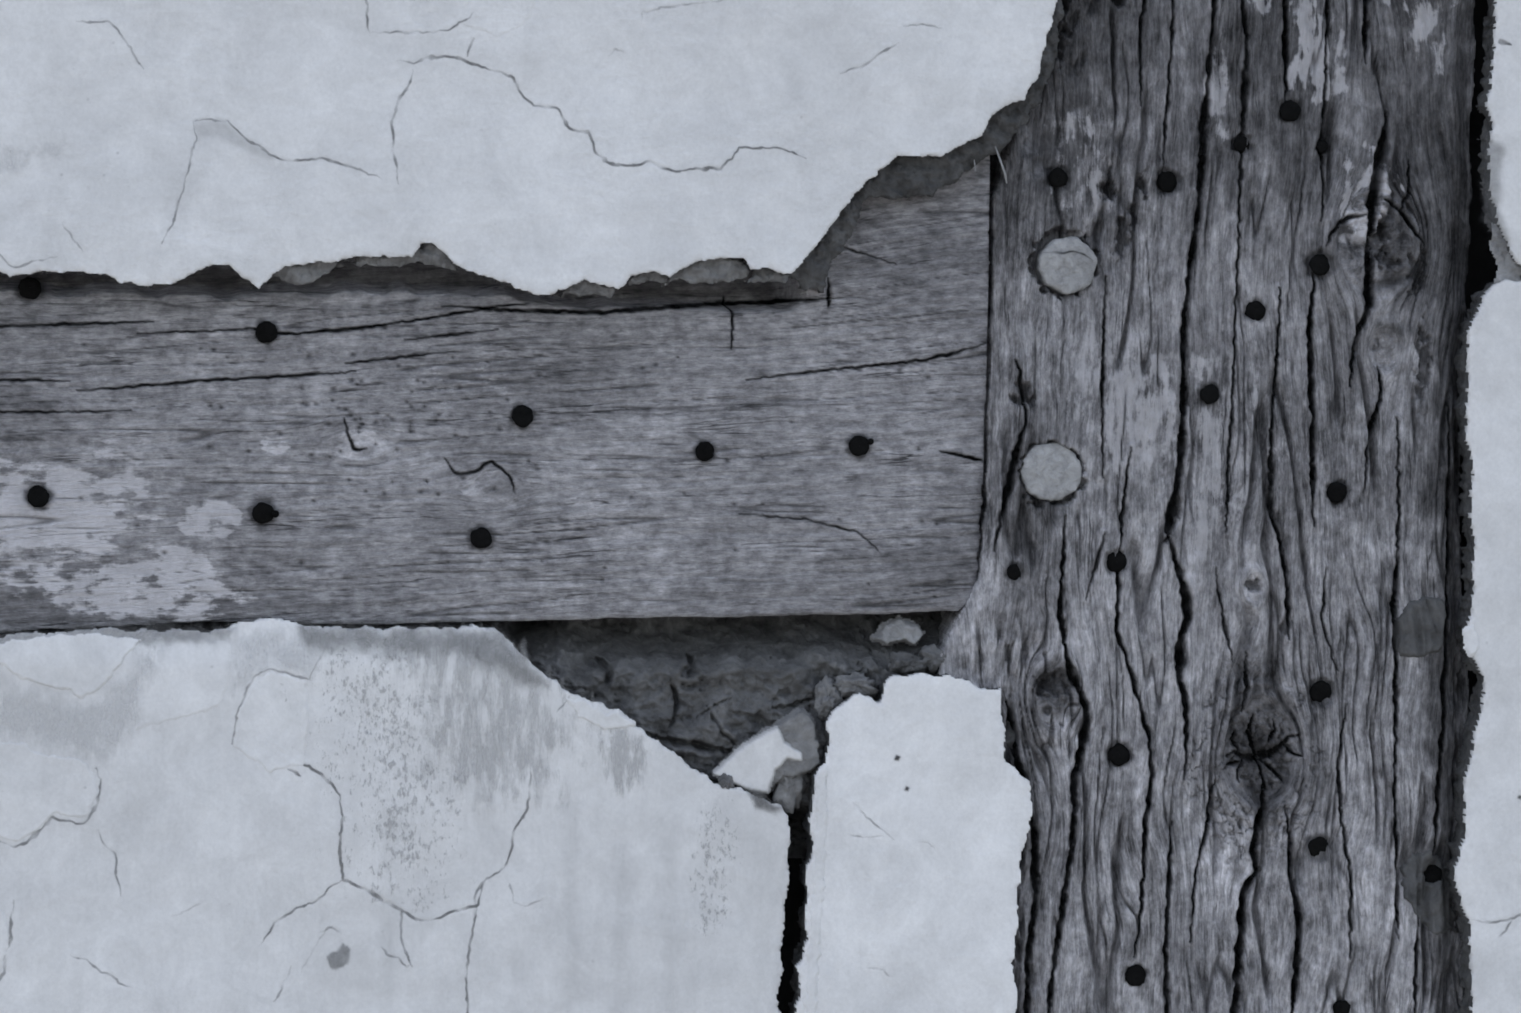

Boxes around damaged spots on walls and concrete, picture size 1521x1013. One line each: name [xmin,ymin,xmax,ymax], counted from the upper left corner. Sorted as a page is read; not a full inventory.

crack [236,129,342,165]
crack [444,22,797,172]
spalling [543,0,1064,299]
spalling [250,243,521,291]
crack [1489,222,1521,284]
spalling [0,611,1000,1013]
spalling [1005,721,1015,767]
crack [266,764,529,1013]